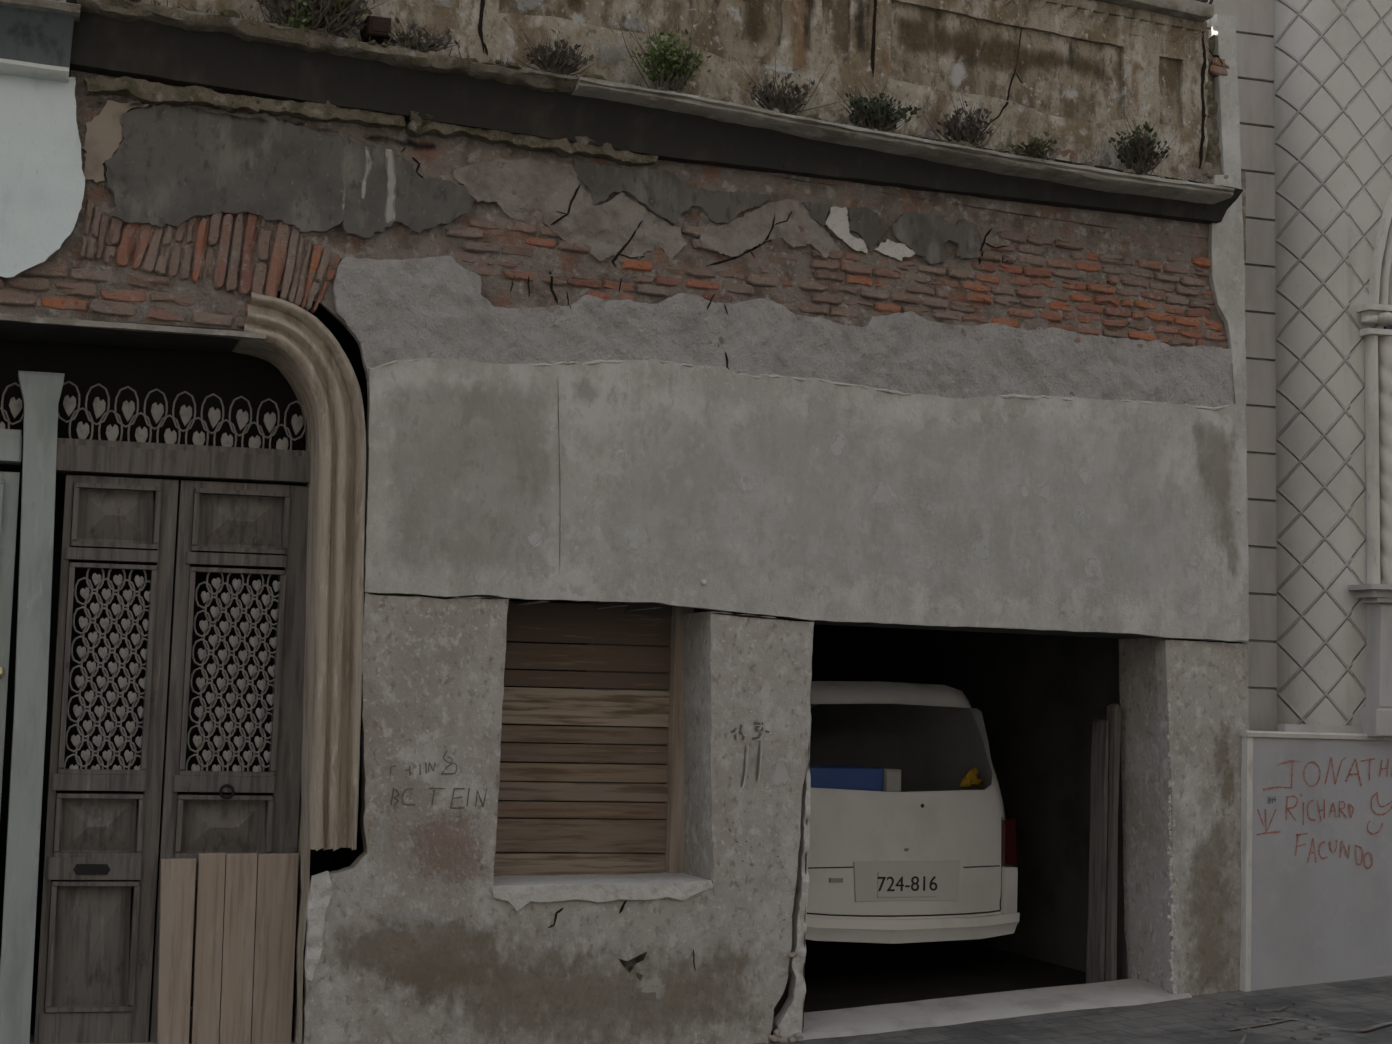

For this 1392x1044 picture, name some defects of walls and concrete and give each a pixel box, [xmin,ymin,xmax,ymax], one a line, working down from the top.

damp [804,0,814,49]
damp [856,0,865,49]
crack [983,21,1026,132]
peeling [0,100,1228,349]
damp [341,912,745,1044]